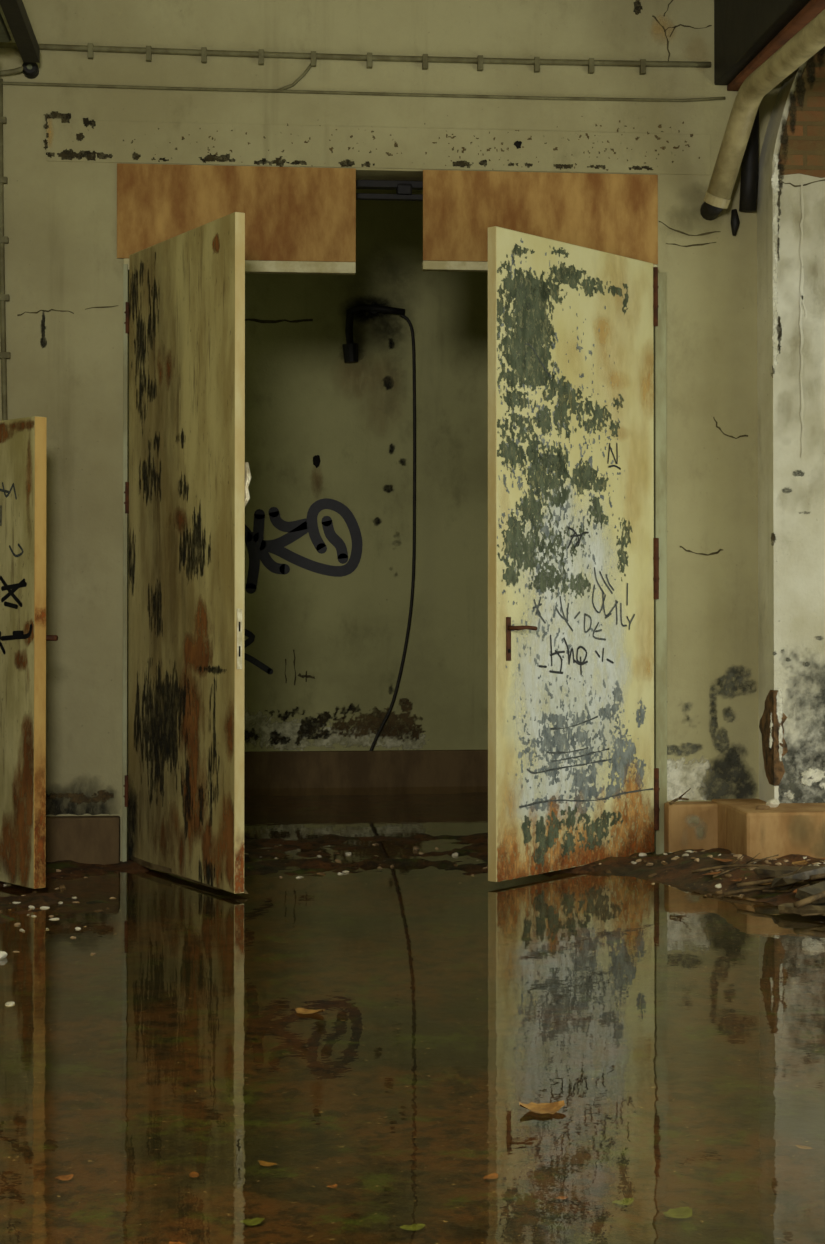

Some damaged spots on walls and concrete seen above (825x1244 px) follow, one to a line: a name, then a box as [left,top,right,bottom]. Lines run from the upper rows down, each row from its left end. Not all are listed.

peeling [43,111,113,161]
peeling [199,153,235,163]
peeling [254,156,307,167]
peeling [453,159,487,168]
rust [0,421,34,443]
peeling [497,238,647,870]
rust [15,610,46,669]
rust [161,600,244,893]
damp [667,667,756,800]
damp [773,649,825,803]
rust [0,718,46,888]
rust [497,774,655,882]